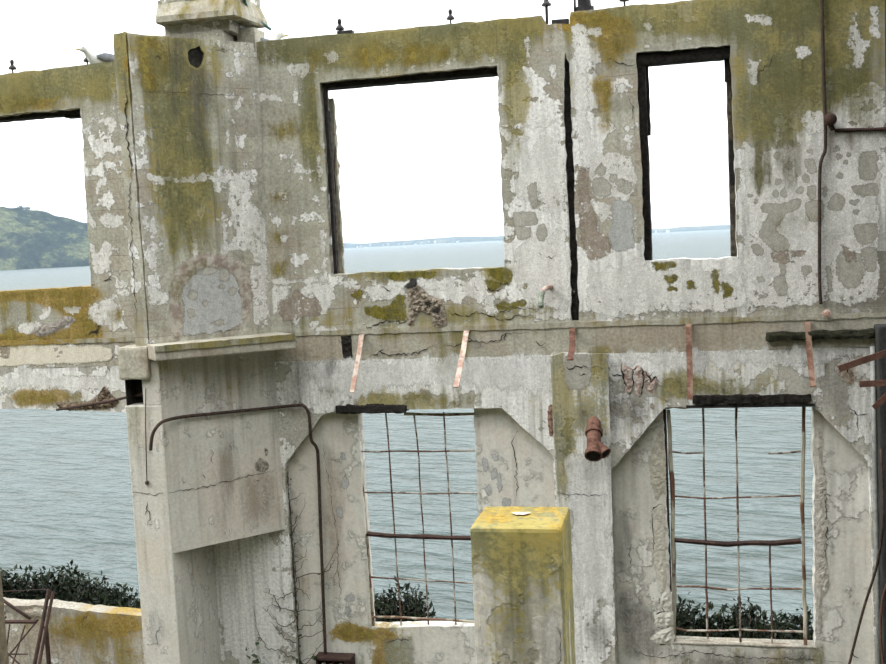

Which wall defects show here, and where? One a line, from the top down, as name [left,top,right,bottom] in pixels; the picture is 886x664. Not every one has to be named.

peeling [744,14,773,26]
peeling [846,6,881,68]
peeling [82,117,117,147]
peeling [87,209,124,229]
crack [124,90,240,322]
peeling [142,23,883,330]
leakage [755,142,771,195]
peeling [90,241,112,275]
peeling [0,280,130,411]
peeling [607,341,837,410]
spalling [649,428,676,645]